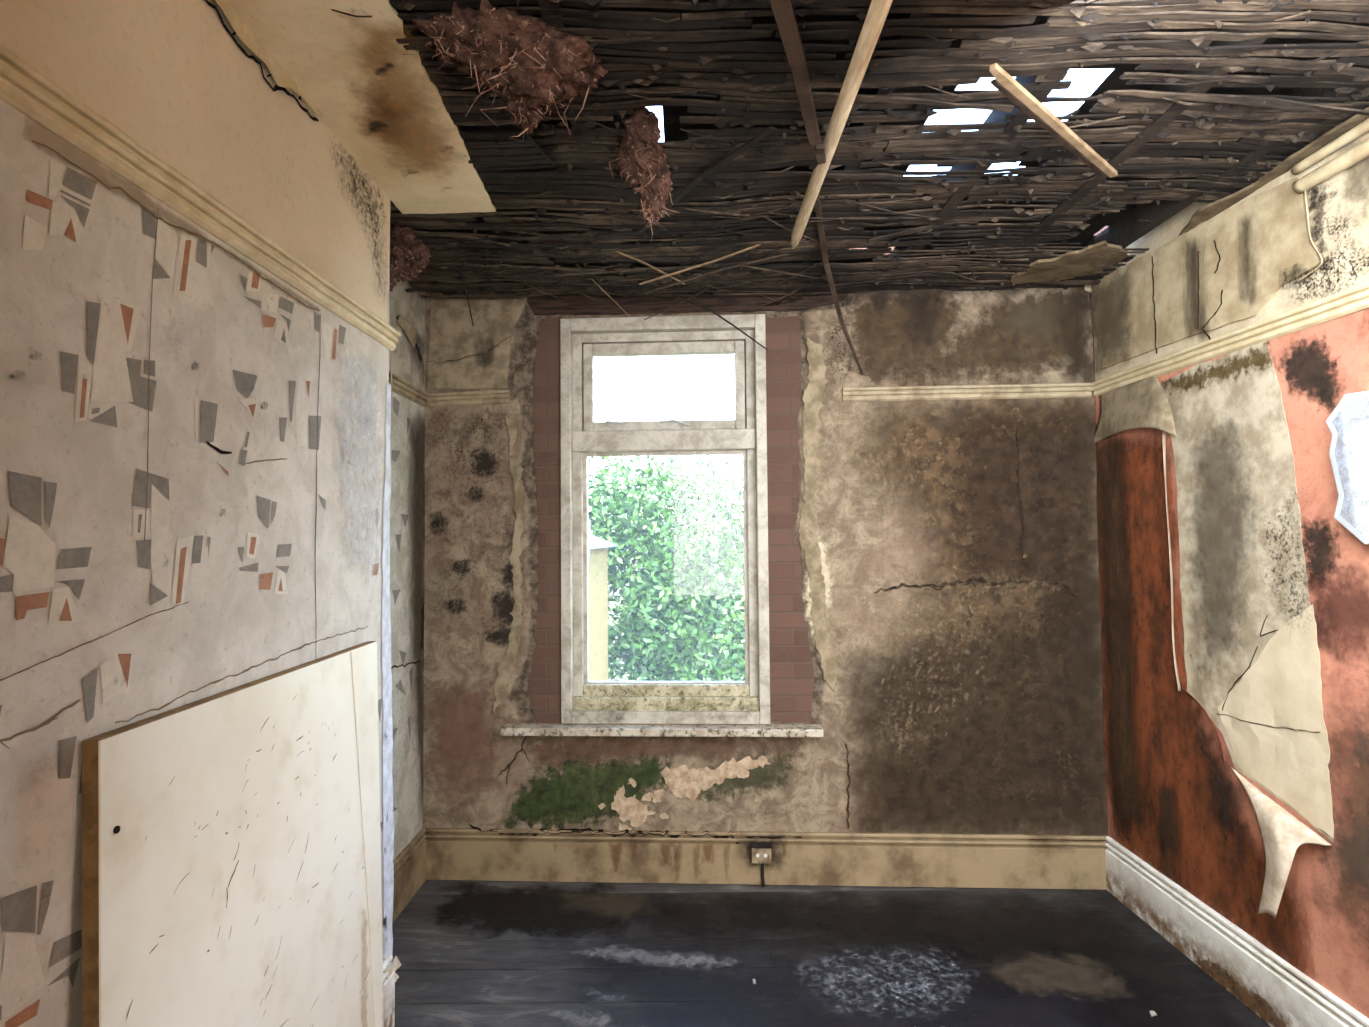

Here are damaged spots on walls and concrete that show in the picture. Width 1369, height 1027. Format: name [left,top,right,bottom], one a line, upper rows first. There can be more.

crack [205,0,324,122]
crack [331,9,372,17]
leakage [363,31,448,174]
mould [1291,212,1369,300]
leakage [1162,339,1339,411]
crack [874,427,1076,598]
mould [487,564,515,645]
leakage [803,536,851,637]
leakage [830,267,1308,978]
leakage [1267,508,1369,650]
flaking render [598,755,770,831]
leakage [1328,735,1369,925]